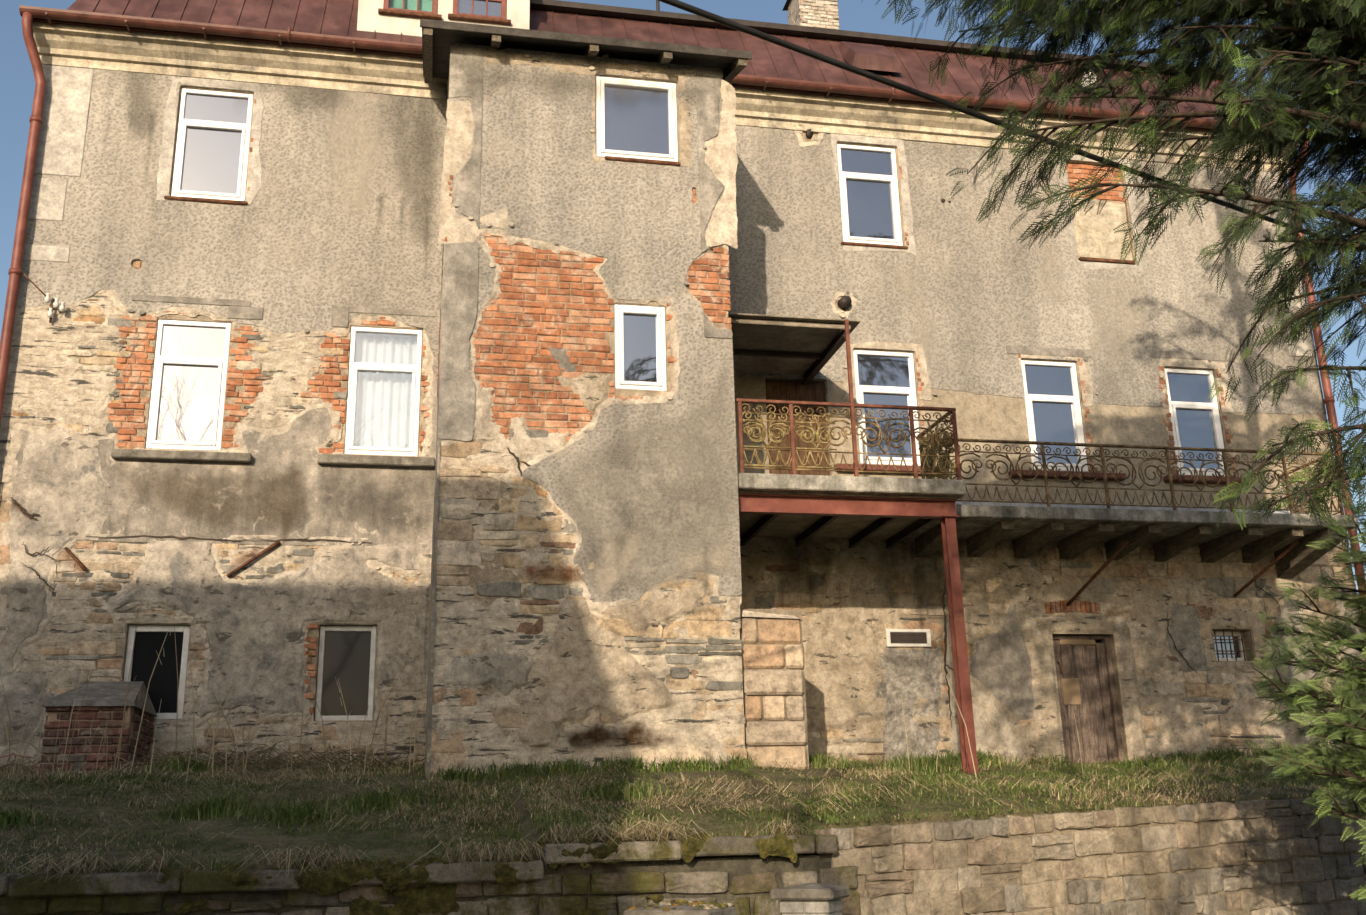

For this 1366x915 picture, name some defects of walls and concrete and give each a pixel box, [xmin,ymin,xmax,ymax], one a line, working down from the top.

spalling [0,46,747,779]
flaking render [1067,164,1125,202]